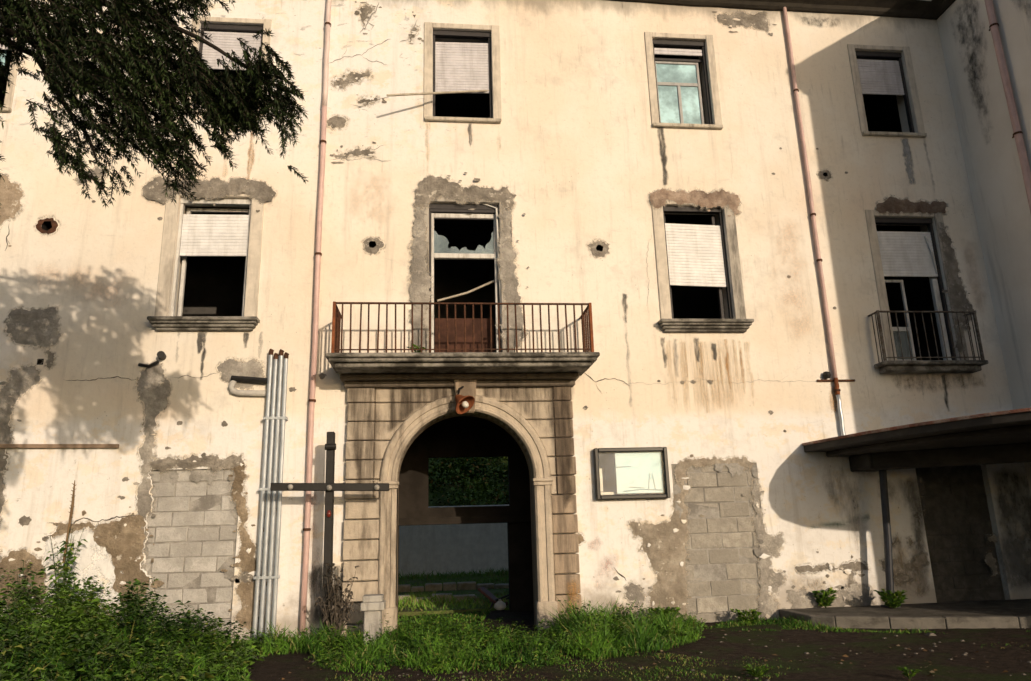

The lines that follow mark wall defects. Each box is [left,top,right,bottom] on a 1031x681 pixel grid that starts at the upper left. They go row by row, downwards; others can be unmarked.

flaking render [712,10,777,36]
leakage [958,6,983,107]
flaking render [142,176,276,221]
flaking render [649,188,741,217]
leakage [902,138,914,184]
flaking render [408,172,529,349]
flaking render [0,306,62,522]
rust [695,339,730,384]
flaking render [0,358,267,630]
flaking render [613,454,876,619]
leakage [893,478,925,592]
leakage [996,472,1031,586]